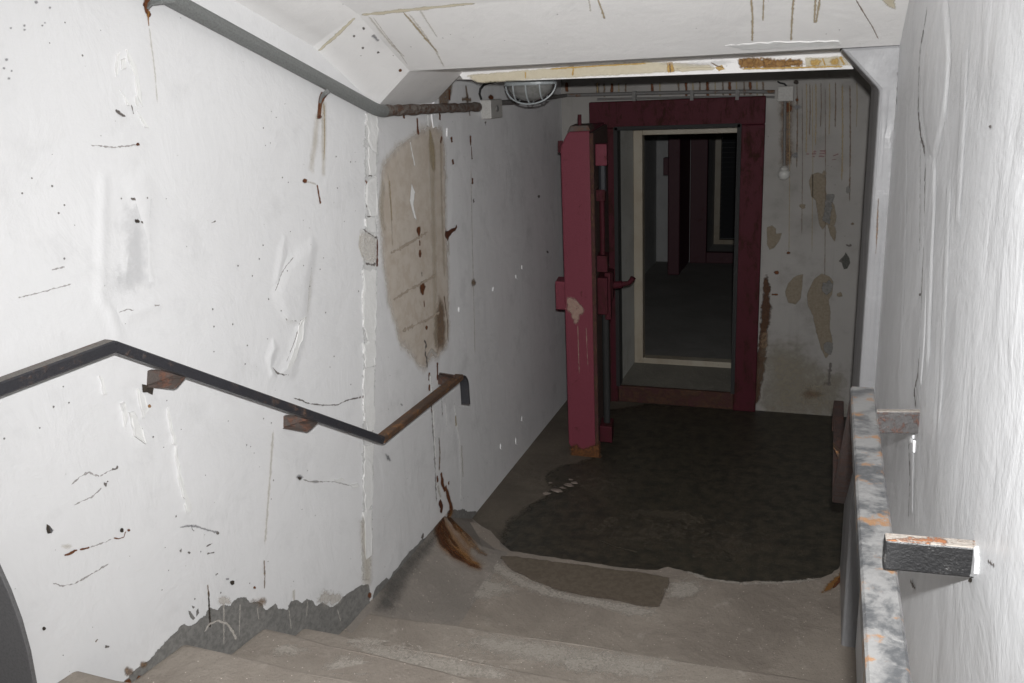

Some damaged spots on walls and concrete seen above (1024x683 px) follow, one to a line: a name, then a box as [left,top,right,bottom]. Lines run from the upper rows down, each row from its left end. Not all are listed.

rust [667,56,848,96]
rust [403,84,471,135]
crack [92,141,140,149]
peeling [799,171,852,269]
rust [756,271,779,403]
peeling [785,274,842,358]
peeling [124,113,477,683]
crack [294,396,364,406]
crack [72,466,118,505]
rust [436,440,487,568]
crack [53,528,130,587]